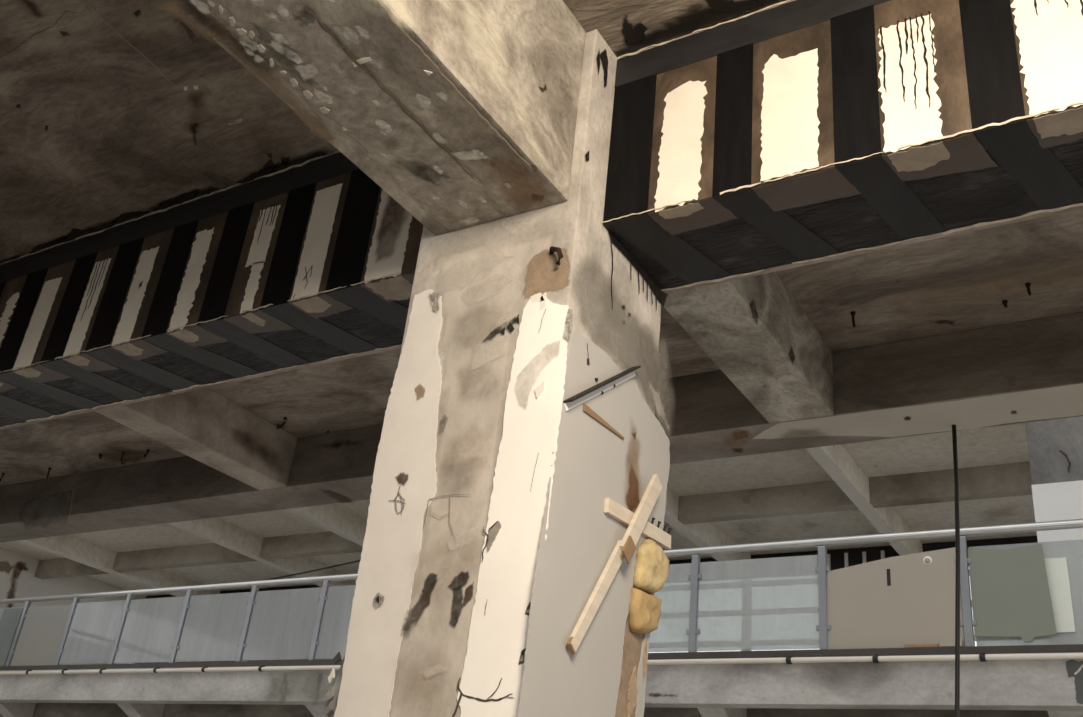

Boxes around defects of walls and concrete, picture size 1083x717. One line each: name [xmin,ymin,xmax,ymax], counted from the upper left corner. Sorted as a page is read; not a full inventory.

flaking render [160,0,508,231]
flaking render [377,0,545,172]
leakage [597,0,787,87]
leakage [896,11,935,107]
flaking render [389,235,570,717]
crack [452,678,513,717]